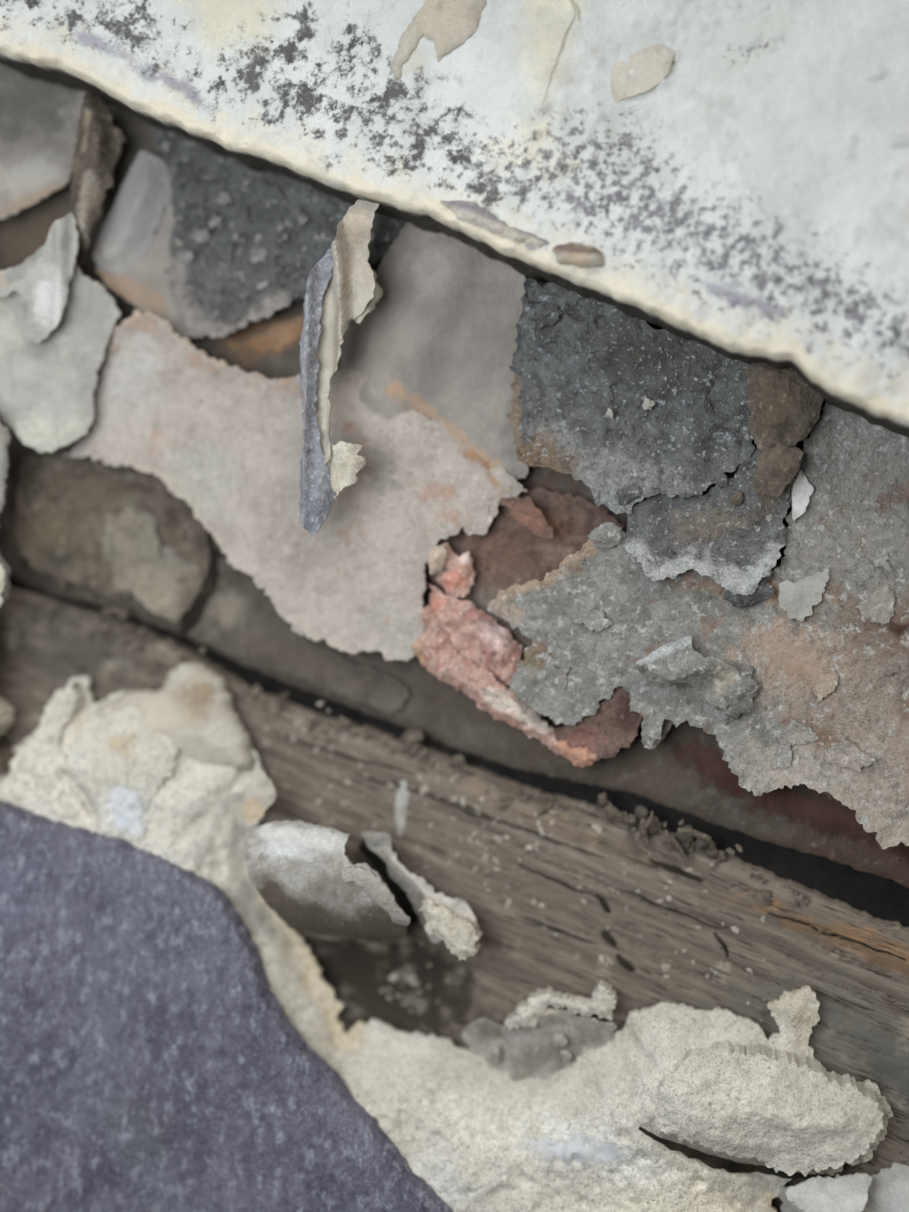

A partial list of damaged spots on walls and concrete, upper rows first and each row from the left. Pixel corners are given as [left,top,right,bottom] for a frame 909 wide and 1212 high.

leakage [3,0,909,378]
spalling [610,44,674,103]
peeling [0,65,909,849]
peeling [95,662,483,961]